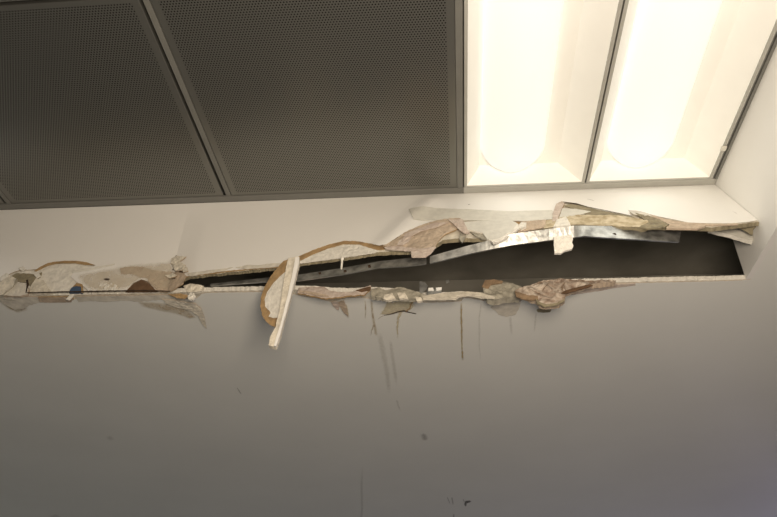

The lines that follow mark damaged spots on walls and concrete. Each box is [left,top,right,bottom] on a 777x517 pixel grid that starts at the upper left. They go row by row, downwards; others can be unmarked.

spalling [409,204,738,255]
spalling [0,261,170,298]
spalling [422,291,521,317]